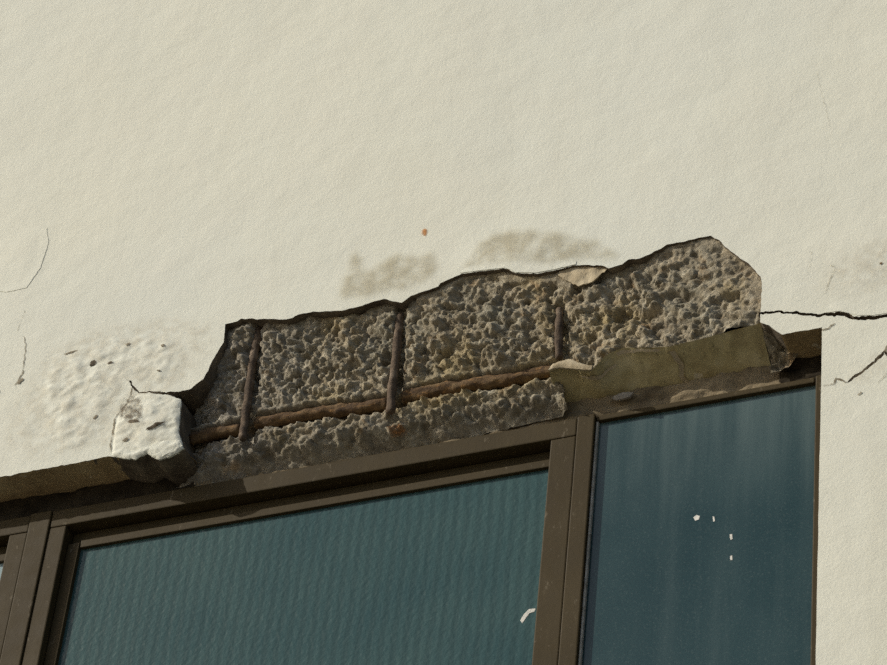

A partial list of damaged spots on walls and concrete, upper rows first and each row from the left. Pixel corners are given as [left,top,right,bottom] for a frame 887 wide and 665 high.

crack [759,310,887,331]
spalling [112,237,799,488]
crack [830,346,887,384]